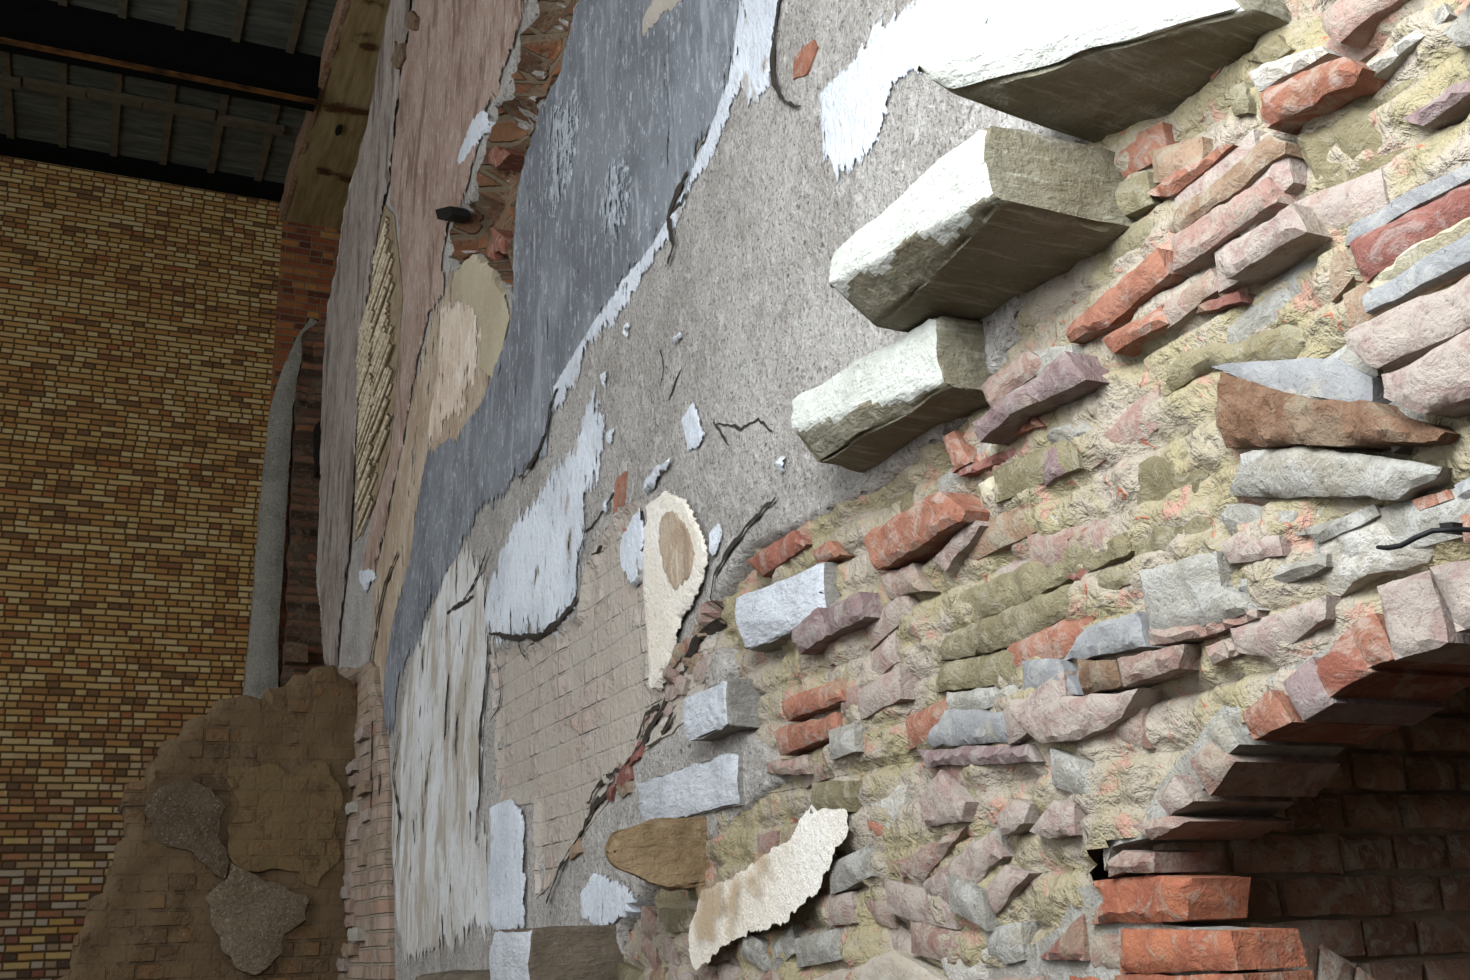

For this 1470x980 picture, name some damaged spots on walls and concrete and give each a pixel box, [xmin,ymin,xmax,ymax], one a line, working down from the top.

peeling [457,109,496,165]
crack [659,350,682,399]
crack [713,417,772,446]
spalling [490,0,1470,980]
peeling [359,568,377,593]
crack [546,497,776,904]
spalling [221,760,343,887]